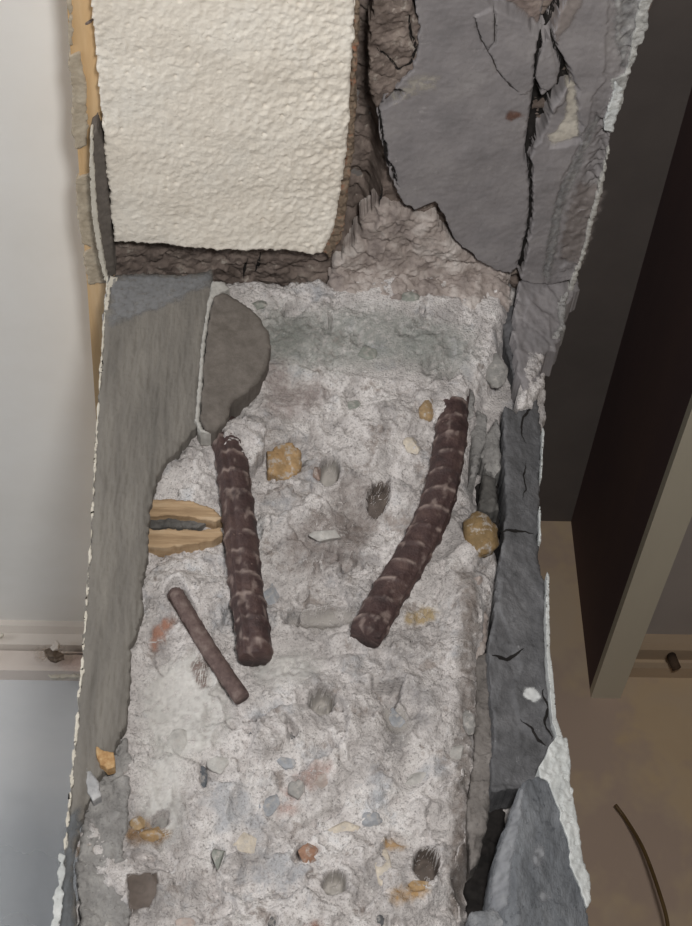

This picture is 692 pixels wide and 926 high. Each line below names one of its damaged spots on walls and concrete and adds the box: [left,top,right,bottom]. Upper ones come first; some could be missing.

crack [475,0,568,266]
spalling [51,0,522,926]
spalling [538,373,546,486]
corrosion [192,661,209,687]
peeling [535,572,591,910]